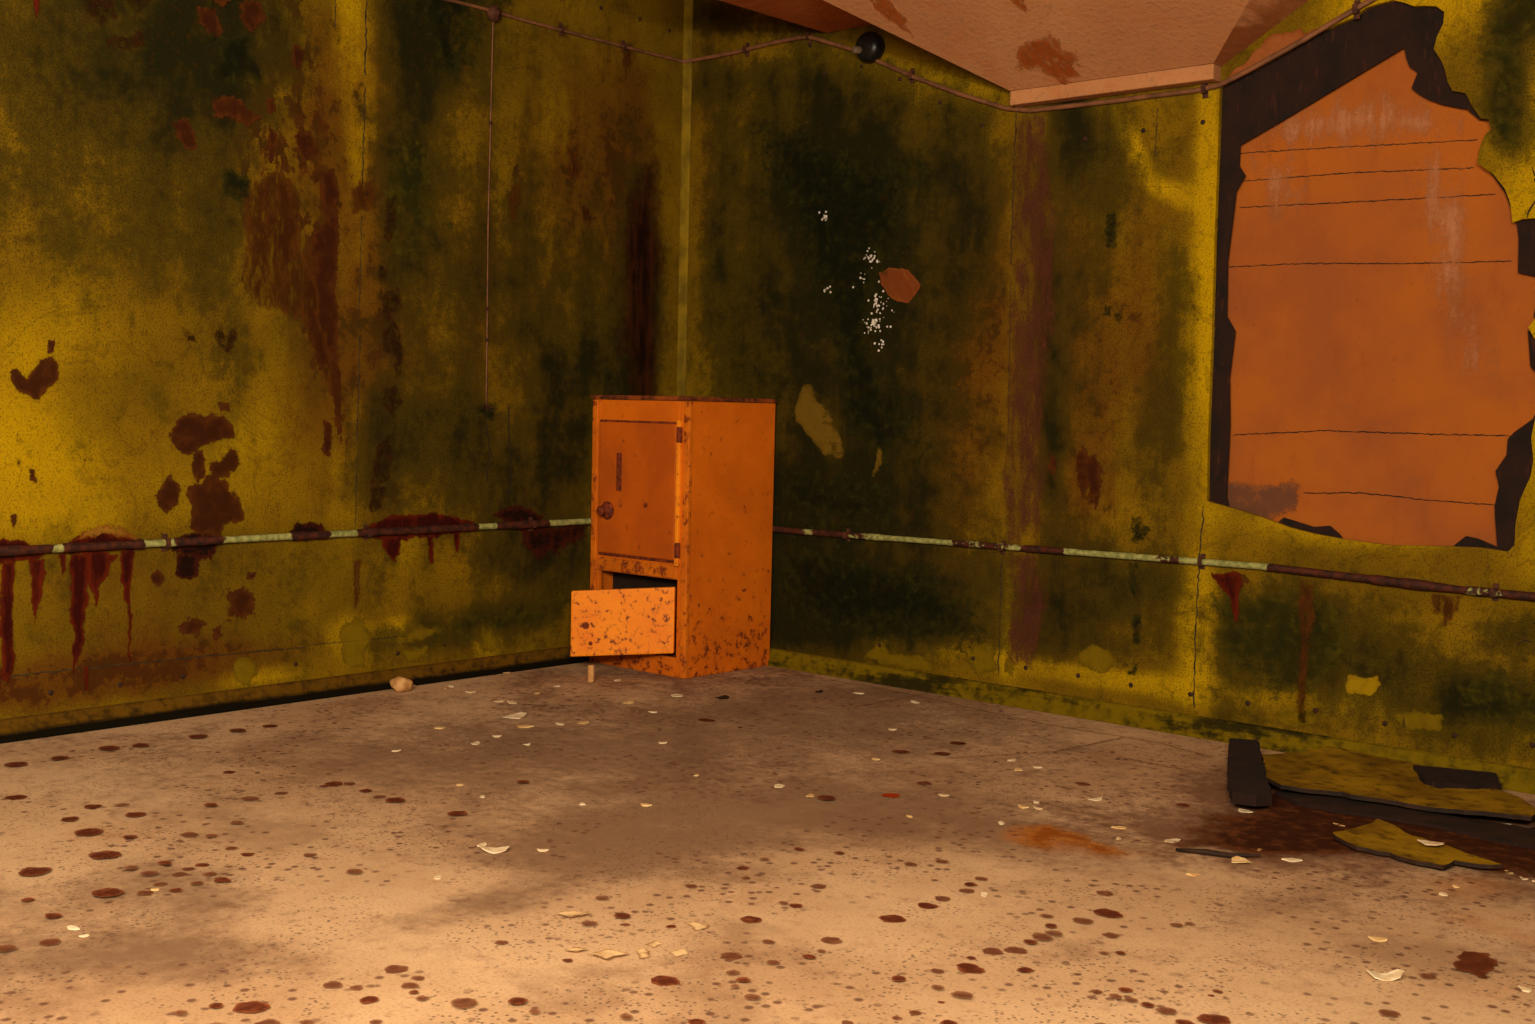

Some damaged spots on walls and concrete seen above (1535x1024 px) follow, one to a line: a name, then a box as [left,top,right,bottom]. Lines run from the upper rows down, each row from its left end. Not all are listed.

rust [870,0,911,34]
rust [1016,35,1080,85]
rust [309,168,375,457]
damp [750,119,932,467]
spalling [1210,1,1535,551]
damp [1003,113,1060,668]
rust [171,532,217,580]
rust [289,520,326,543]
rust [368,512,474,563]
rust [492,505,587,561]
damp [1131,517,1150,541]
rust [0,524,140,690]